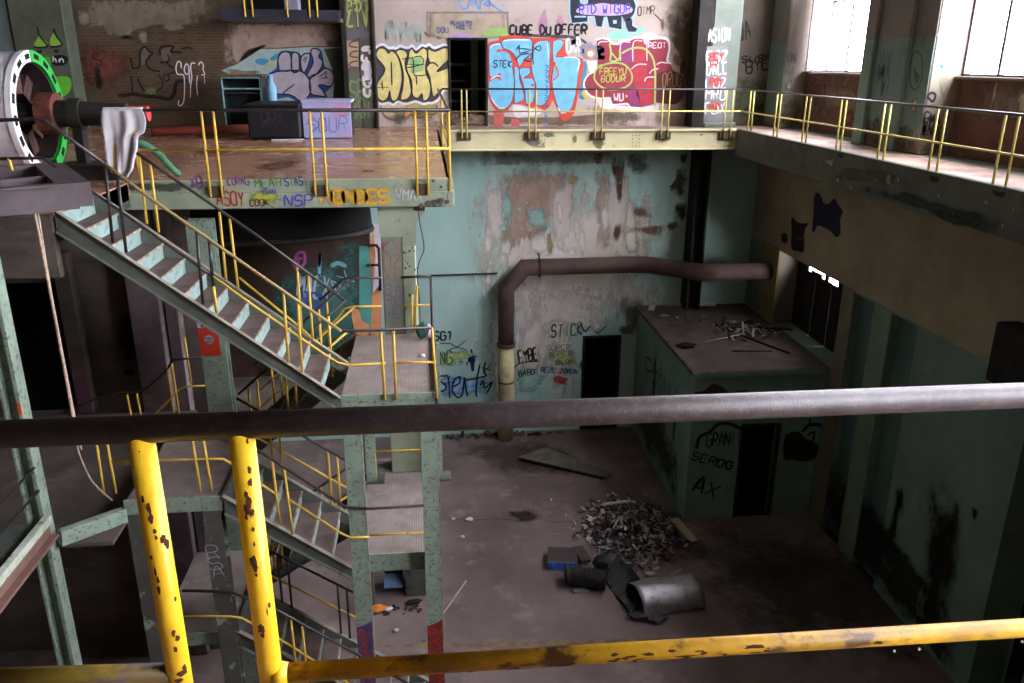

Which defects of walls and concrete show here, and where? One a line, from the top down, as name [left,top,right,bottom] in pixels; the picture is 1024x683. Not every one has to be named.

peeling [78,0,211,90]
peeling [484,169,567,285]
peeling [596,172,612,247]
corrosion [141,495,169,549]
corrosion [244,466,267,577]
corrosion [668,649,707,660]